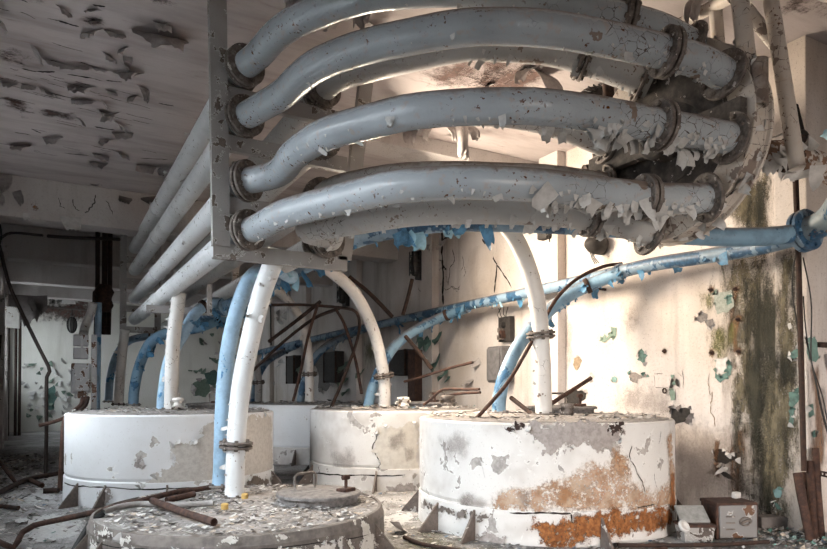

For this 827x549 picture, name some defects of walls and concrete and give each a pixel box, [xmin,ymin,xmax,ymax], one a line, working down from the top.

peeling [0,4,189,224]
peeling [436,217,500,251]
peeling [509,181,701,248]
peeling [696,289,734,330]
peeling [627,349,650,383]
flaking render [668,375,694,425]
water stain [731,264,796,514]
crack [317,436,402,476]
peeling [505,419,626,456]
rust [493,434,676,548]
crack [629,447,657,508]
crack [512,512,573,523]